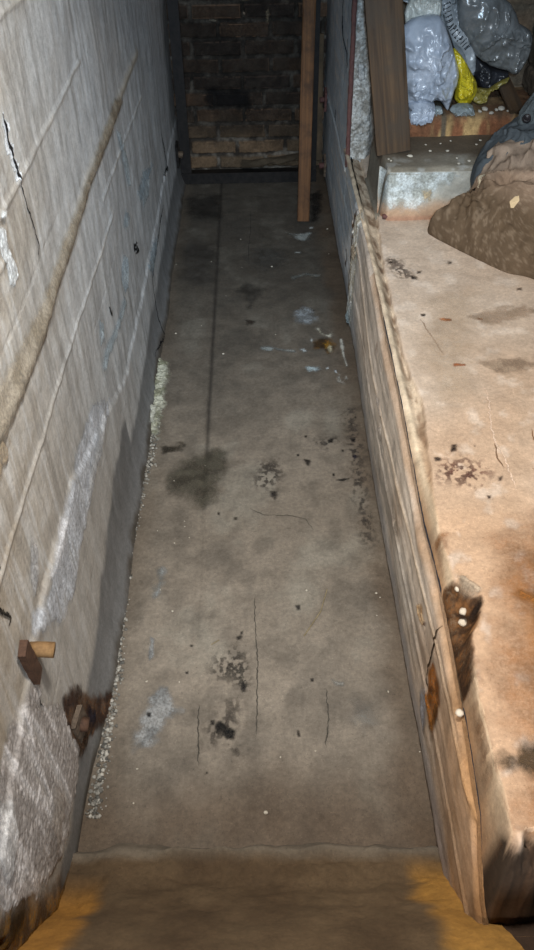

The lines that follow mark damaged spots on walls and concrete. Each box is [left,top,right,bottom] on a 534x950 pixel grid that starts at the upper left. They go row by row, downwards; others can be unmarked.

crack [2,112,39,255]
efflorescence [150,358,168,434]
damp [170,451,225,506]
rust [425,663,439,731]